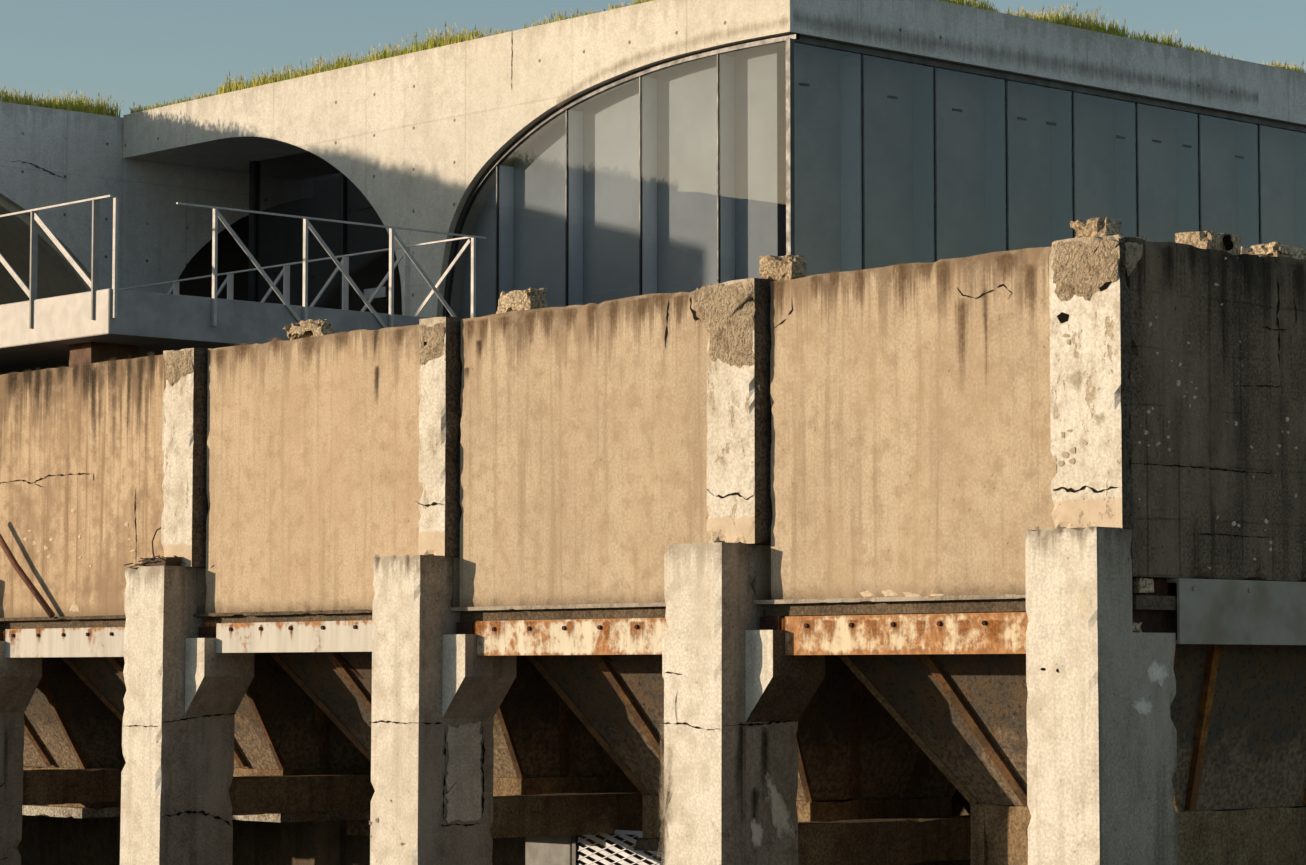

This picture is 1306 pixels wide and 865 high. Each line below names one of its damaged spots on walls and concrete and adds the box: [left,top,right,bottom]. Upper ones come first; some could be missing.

spalling [1052,238,1143,345]
damp [467,317,508,352]
damp [528,305,594,333]
spalling [692,281,755,369]
damp [8,354,154,424]
spalling [1058,429,1087,467]
crack [1,473,94,487]
crack [707,489,753,500]
crack [1053,462,1279,493]
corrosion [630,621,644,637]
corrosion [802,620,876,635]
corrosion [916,620,969,635]